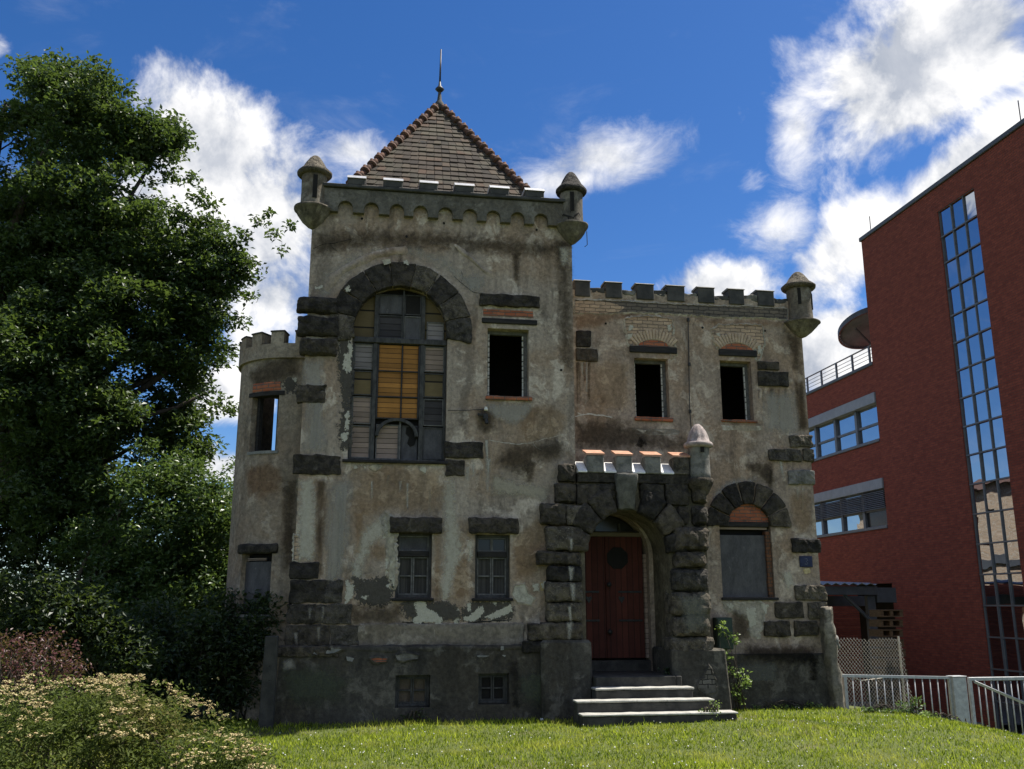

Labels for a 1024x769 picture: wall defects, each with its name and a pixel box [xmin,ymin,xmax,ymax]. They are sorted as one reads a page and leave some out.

spalling [336,340,356,451]
damp [298,480,385,579]
spalling [345,510,545,624]